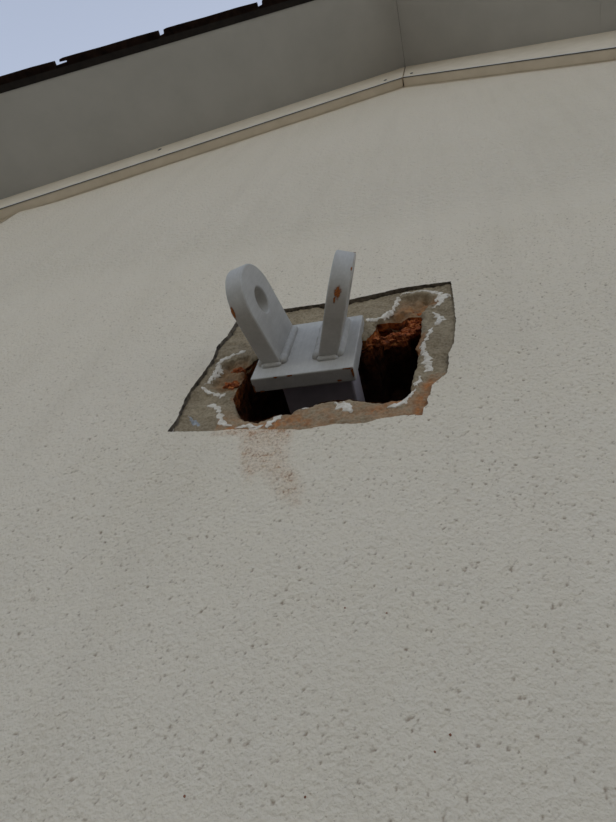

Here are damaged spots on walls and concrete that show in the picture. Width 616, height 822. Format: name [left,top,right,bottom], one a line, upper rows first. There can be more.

hole [168,282,456,432]